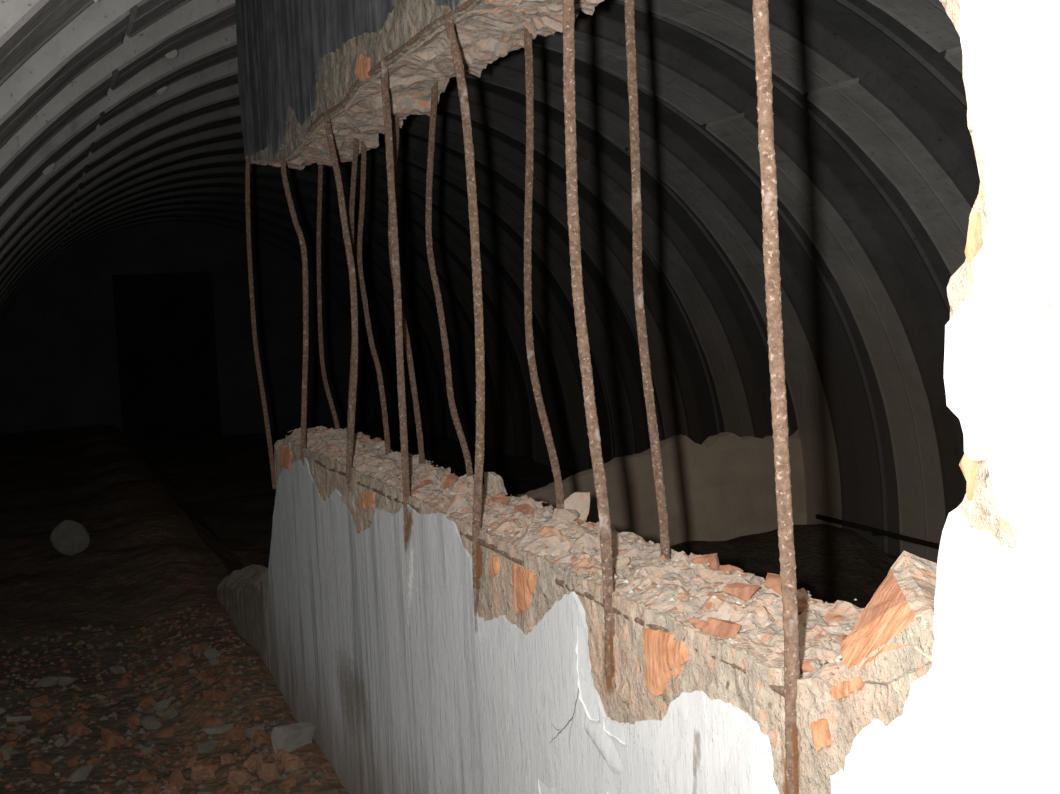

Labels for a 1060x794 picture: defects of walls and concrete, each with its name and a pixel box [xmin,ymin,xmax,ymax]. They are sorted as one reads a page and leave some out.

flaking render [939,0,960,36]
flaking render [947,52,988,319]
flaking render [245,0,937,794]
rust [404,508,412,549]
flaking render [958,453,1016,549]
rust [473,542,482,614]
rust [603,635,613,690]
crack [549,688,579,747]
rust [784,727,798,794]